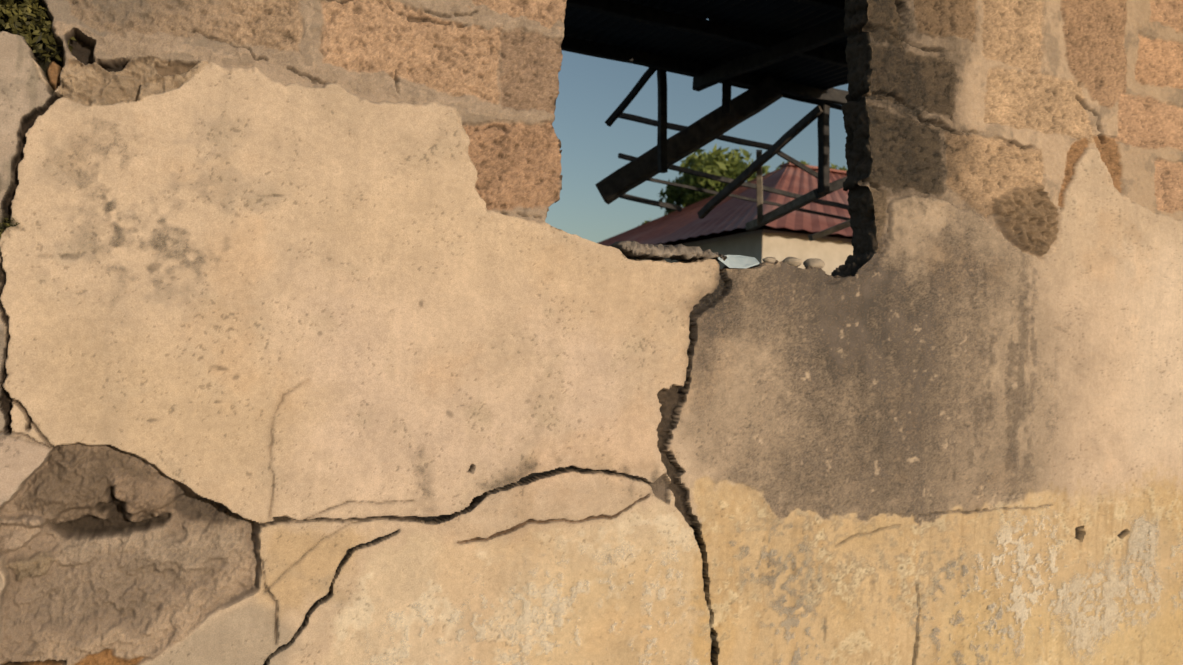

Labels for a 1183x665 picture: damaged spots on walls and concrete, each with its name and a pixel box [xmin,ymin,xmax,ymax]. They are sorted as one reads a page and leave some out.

crack [0,90,63,451]
spalling [0,0,211,108]
spalling [749,260,791,269]
spalling [805,0,878,278]
spalling [0,441,295,665]
crack [258,262,731,665]